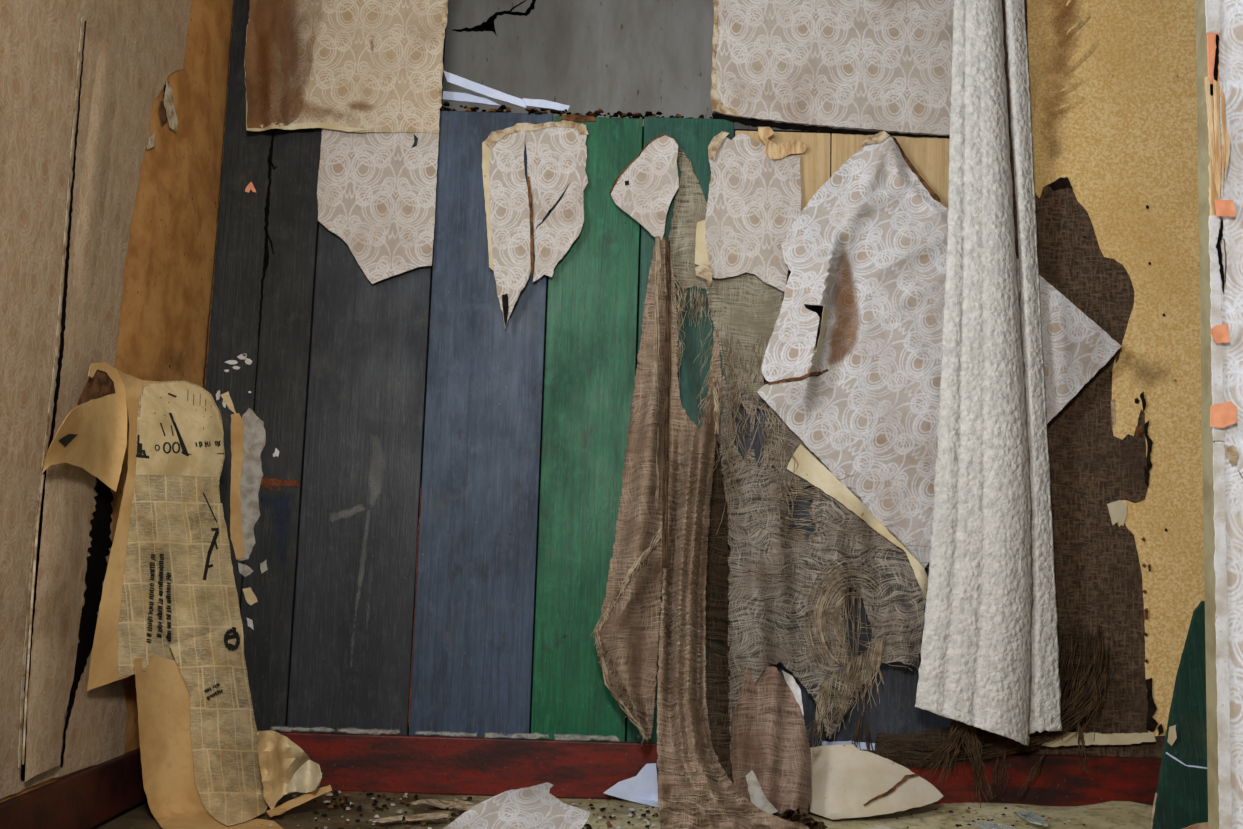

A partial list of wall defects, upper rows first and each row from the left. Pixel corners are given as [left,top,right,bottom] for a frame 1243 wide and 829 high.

crack [452,0,536,36]
damp [244,0,316,128]
peeling [164,81,178,132]
peeling [708,131,729,161]
peeling [758,127,807,160]
peeling [1049,177,1073,190]
peeling [224,353,253,372]
peeling [216,390,279,630]